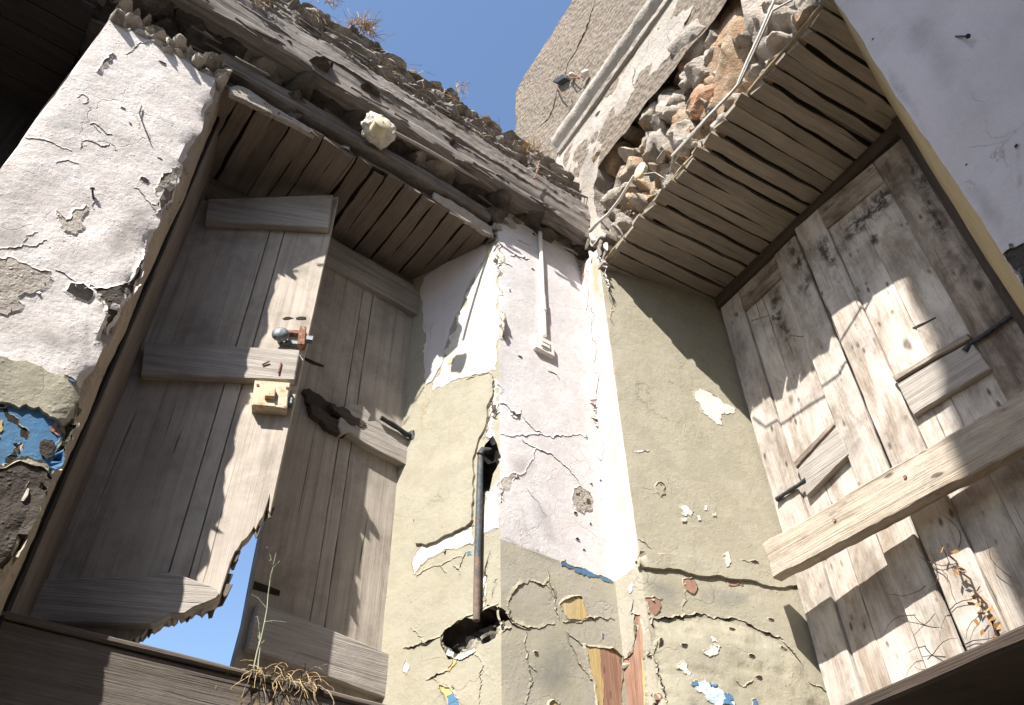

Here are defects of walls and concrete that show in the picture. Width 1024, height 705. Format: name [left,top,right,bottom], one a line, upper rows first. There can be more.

crack [565,1,595,74]
crack [25,93,118,164]
crack [0,231,47,249]
peeling [0,255,54,317]
spalling [92,231,153,335]
peeling [431,244,507,446]
crack [450,256,614,515]
peeling [693,389,736,426]
spalling [0,403,83,574]
peeling [582,582,663,705]
crack [544,569,826,704]
peeling [675,660,736,705]